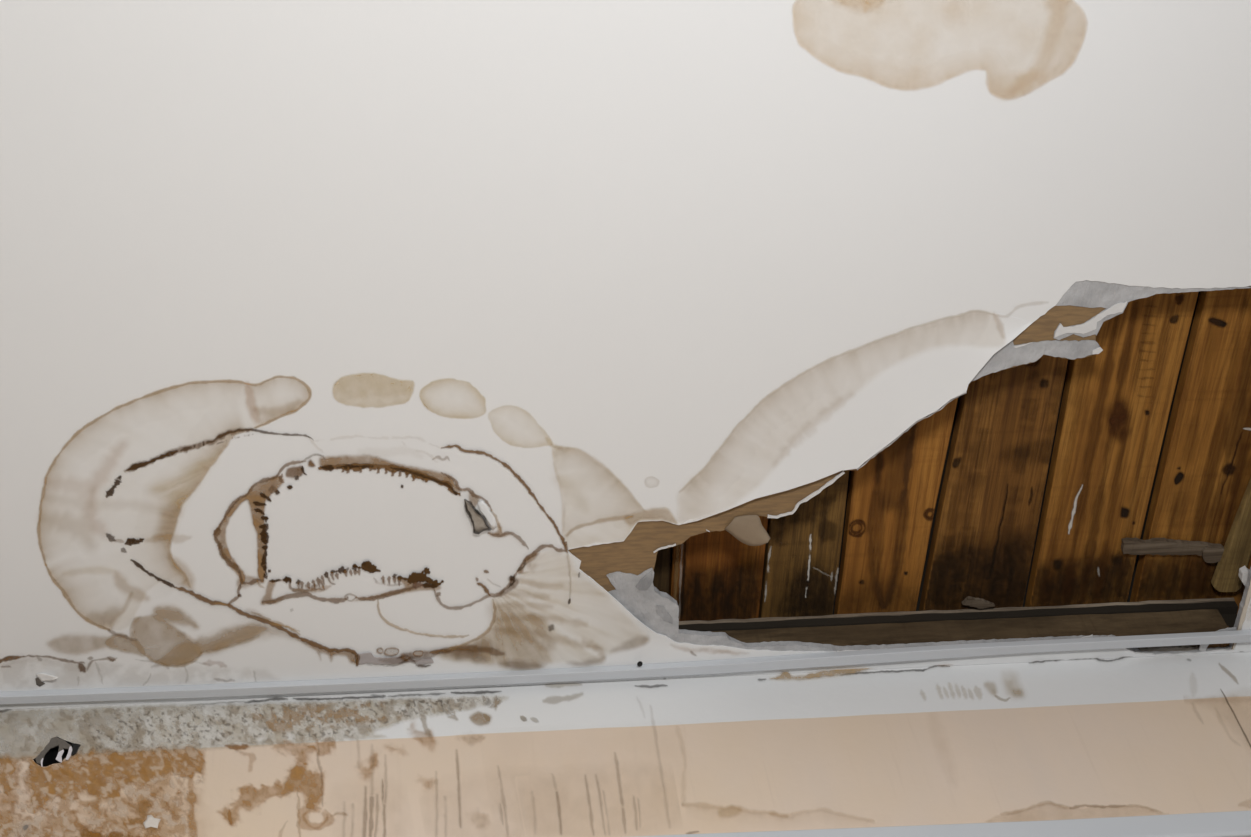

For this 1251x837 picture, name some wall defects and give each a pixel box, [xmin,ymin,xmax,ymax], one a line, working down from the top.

damp [38,376,566,666]
hole [35,737,81,767]
peeling [143,815,161,829]